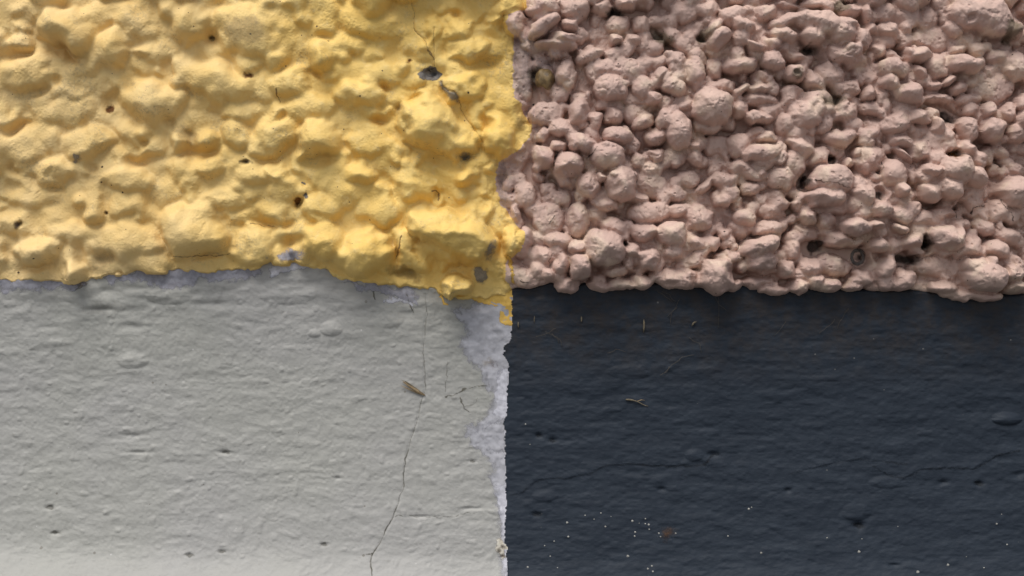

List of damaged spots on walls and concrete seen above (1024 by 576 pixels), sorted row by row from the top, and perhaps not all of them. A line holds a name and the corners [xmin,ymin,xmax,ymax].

peeling [0,279,86,294]
peeling [106,248,309,289]
peeling [348,280,419,306]
peeling [453,297,519,576]